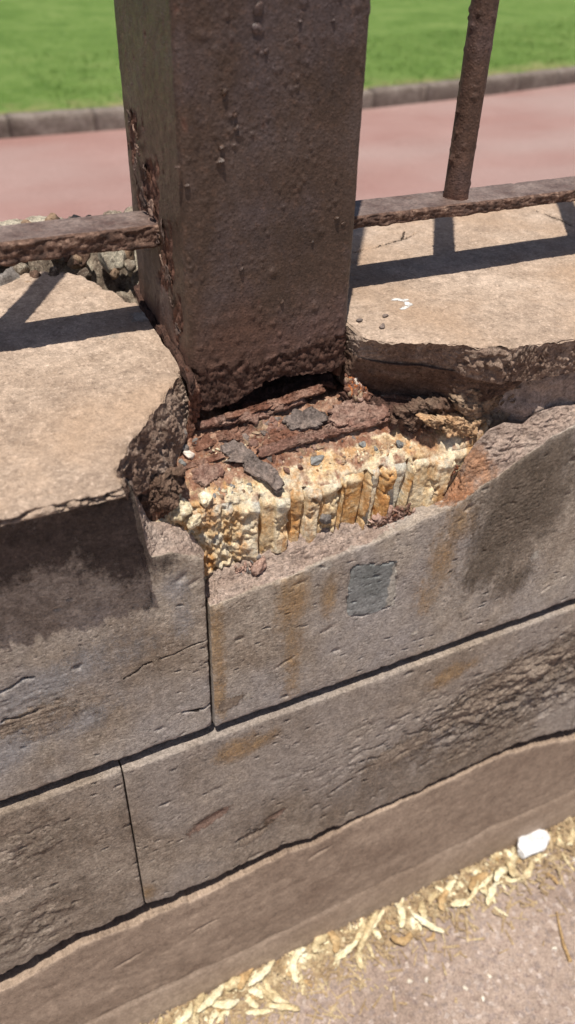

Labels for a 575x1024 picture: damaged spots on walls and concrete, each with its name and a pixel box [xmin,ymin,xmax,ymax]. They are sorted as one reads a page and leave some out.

spalling [114,371,204,558]
spalling [199,443,256,499]
peeling [238,414,291,449]
corrosion [184,329,409,489]
peeling [263,434,396,471]
corrosion [416,429,436,452]
spalling [344,314,575,506]
spalling [205,503,416,605]